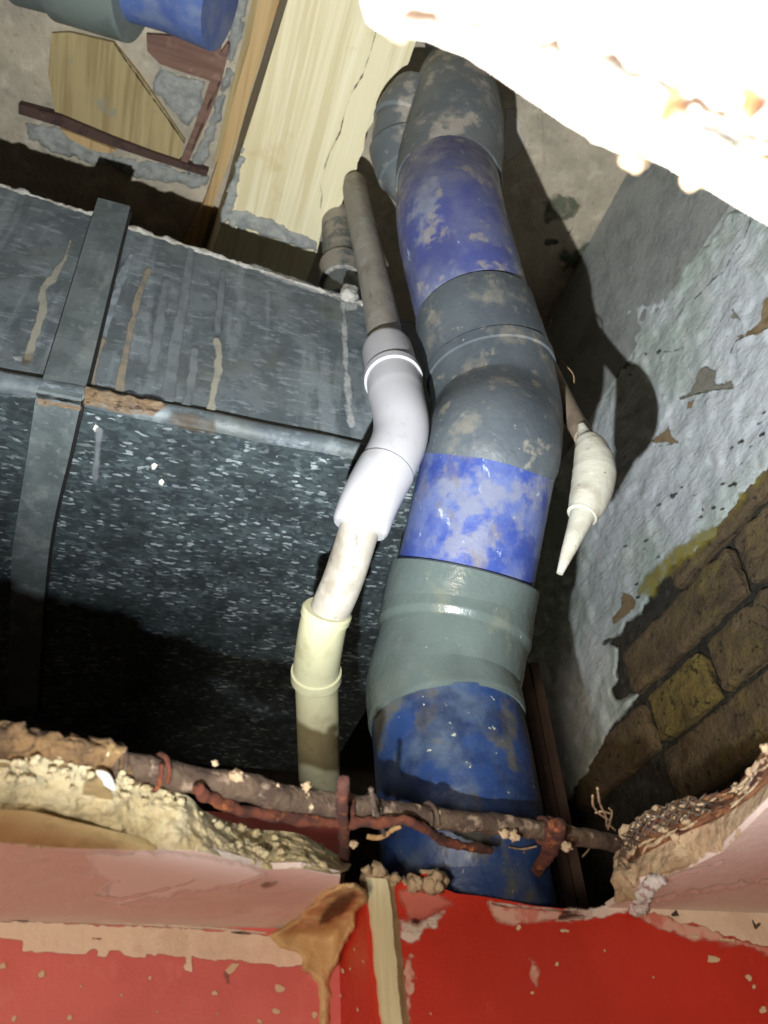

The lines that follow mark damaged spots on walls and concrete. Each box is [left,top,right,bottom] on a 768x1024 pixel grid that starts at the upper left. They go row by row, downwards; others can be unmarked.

leakage [24,240,72,361]
rust [36,387,166,416]
leakage [91,254,134,388]
leakage [114,268,151,395]
leakage [148,247,199,407]
leakage [207,270,226,412]
peeling [679,367,733,409]
leakage [638,527,717,596]
spalling [488,469,768,932]
peeling [0,922,303,974]
leakage [320,893,355,925]